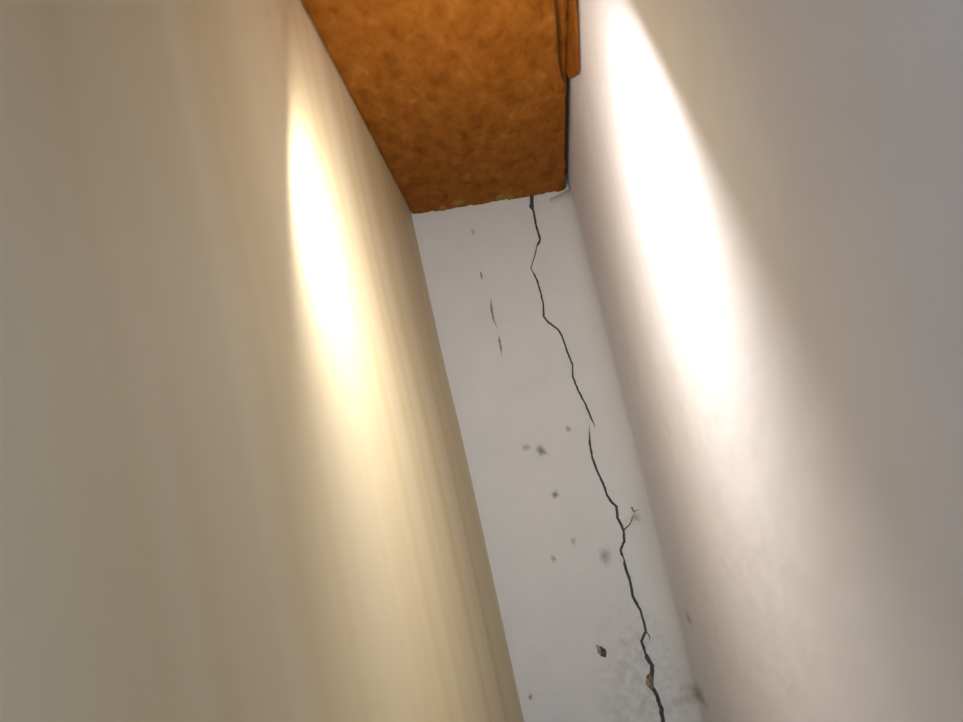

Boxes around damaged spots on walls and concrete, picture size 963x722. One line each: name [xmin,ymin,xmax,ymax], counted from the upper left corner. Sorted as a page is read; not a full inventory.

crack [529,196,667,722]